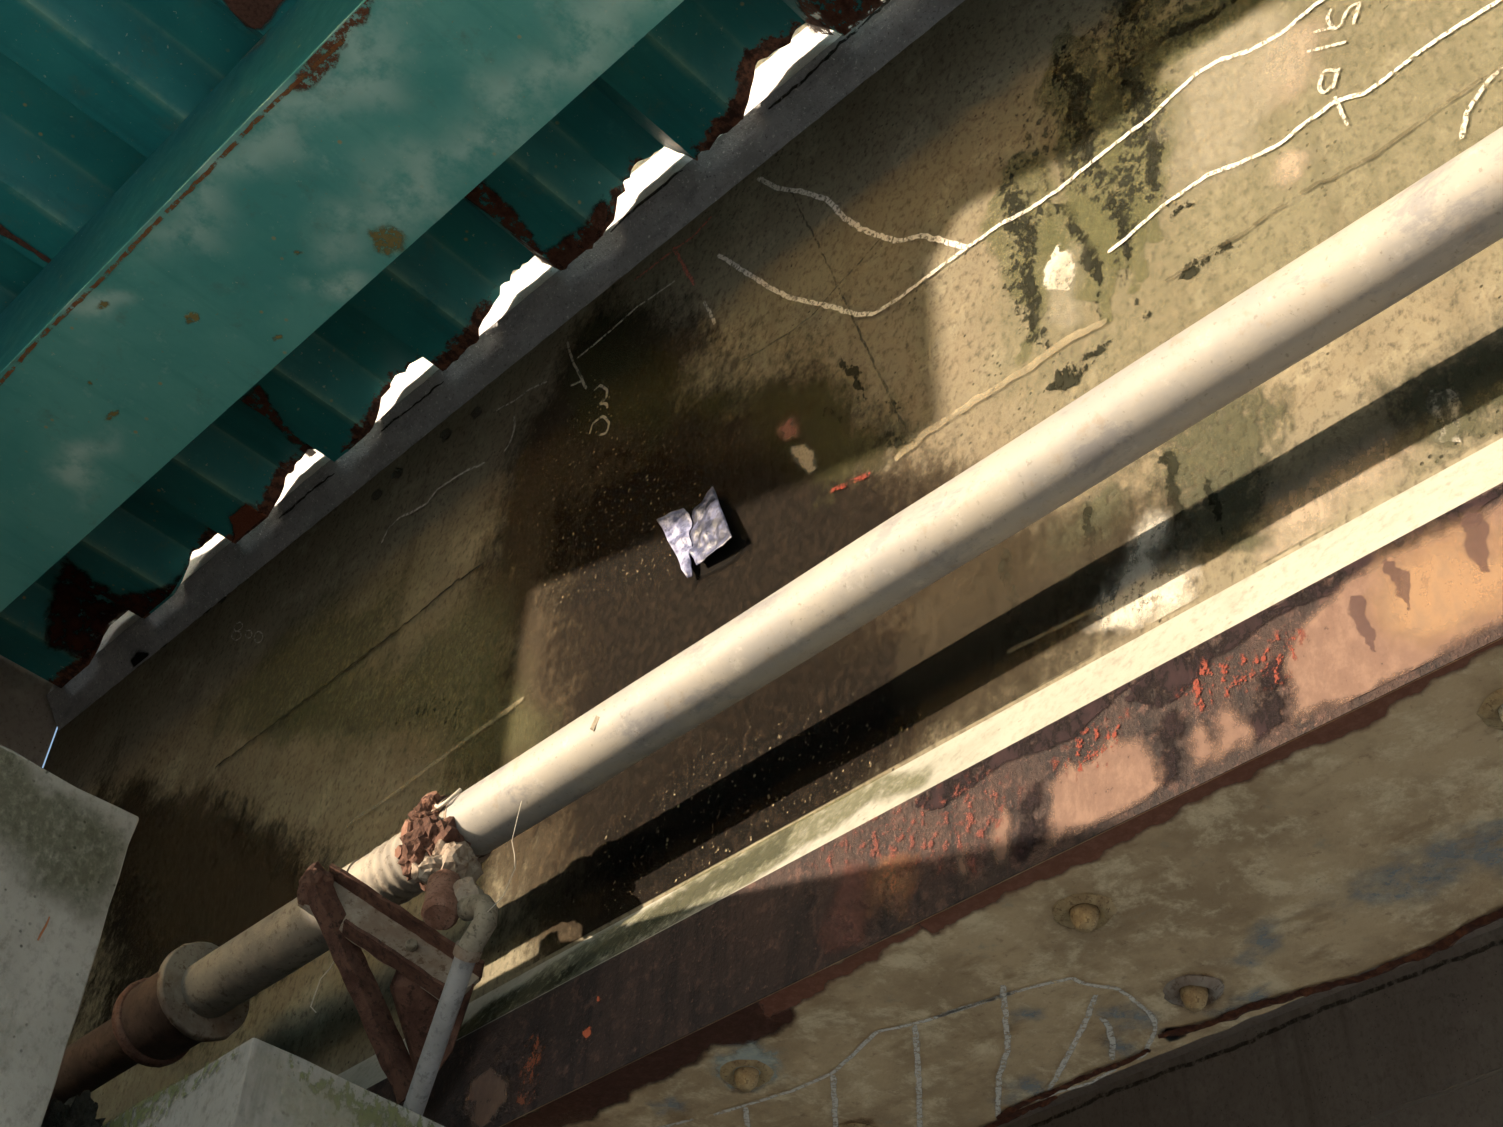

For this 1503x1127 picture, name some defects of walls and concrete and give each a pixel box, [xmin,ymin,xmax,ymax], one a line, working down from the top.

corrosion [0,0,373,385]
corrosion [465,180,611,271]
corrosion [797,0,887,36]
leakage [983,0,1260,391]
leakage [1262,27,1315,94]
leakage [1279,153,1304,180]
corrosion [45,558,183,659]
corrosion [241,385,316,458]
leakage [450,284,976,789]
leakage [479,501,1185,962]
leakage [72,778,328,1034]
corrosion [501,629,1503,1127]